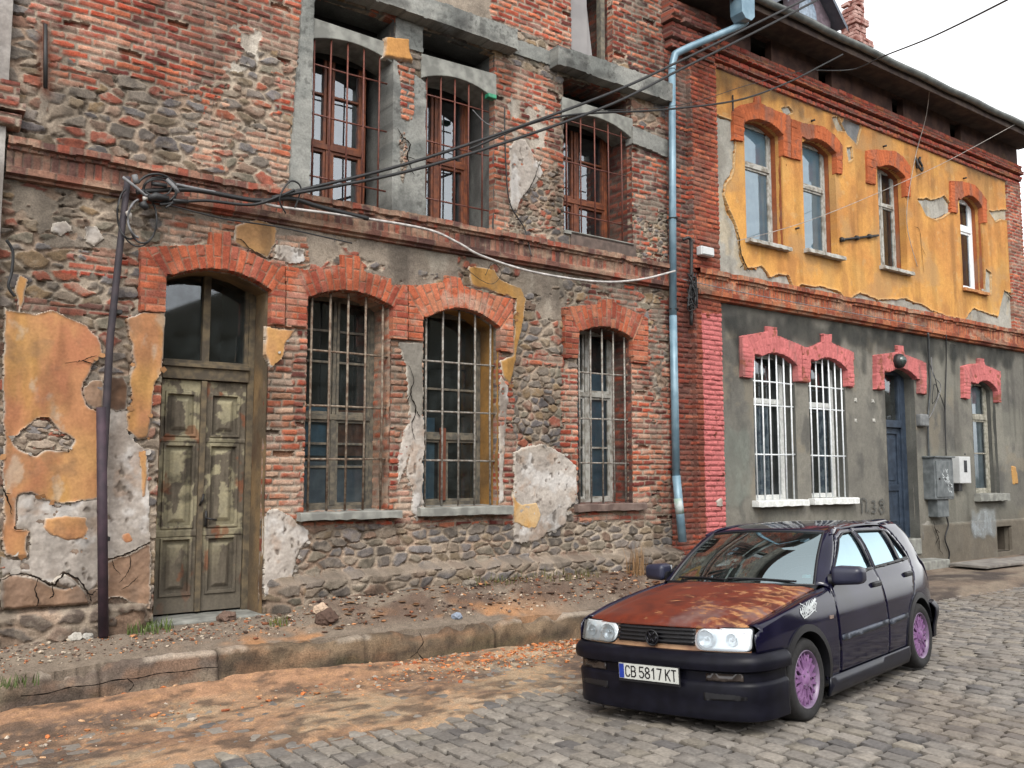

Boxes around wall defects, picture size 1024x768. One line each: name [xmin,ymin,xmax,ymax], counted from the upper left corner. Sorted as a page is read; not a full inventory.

crack [398,129,415,177]
flaking render [508,139,543,211]
spalling [716,117,790,284]
spalling [919,197,949,219]
flaking render [234,220,305,264]
spalling [853,294,937,313]
spalling [966,292,1011,328]
flaking render [0,274,167,591]
crack [406,366,420,439]
flaking render [467,266,578,544]
crack [2,542,151,605]
crack [21,667,218,697]